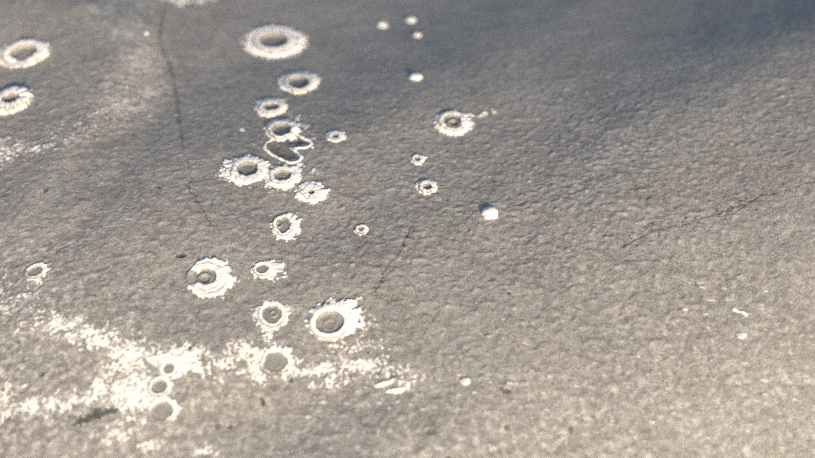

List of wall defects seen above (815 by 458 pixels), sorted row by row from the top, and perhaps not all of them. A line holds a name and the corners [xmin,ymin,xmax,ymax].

crack [157,0,211,224]
leakage [0,264,274,457]
leakage [282,313,436,394]
crack [374,227,415,293]